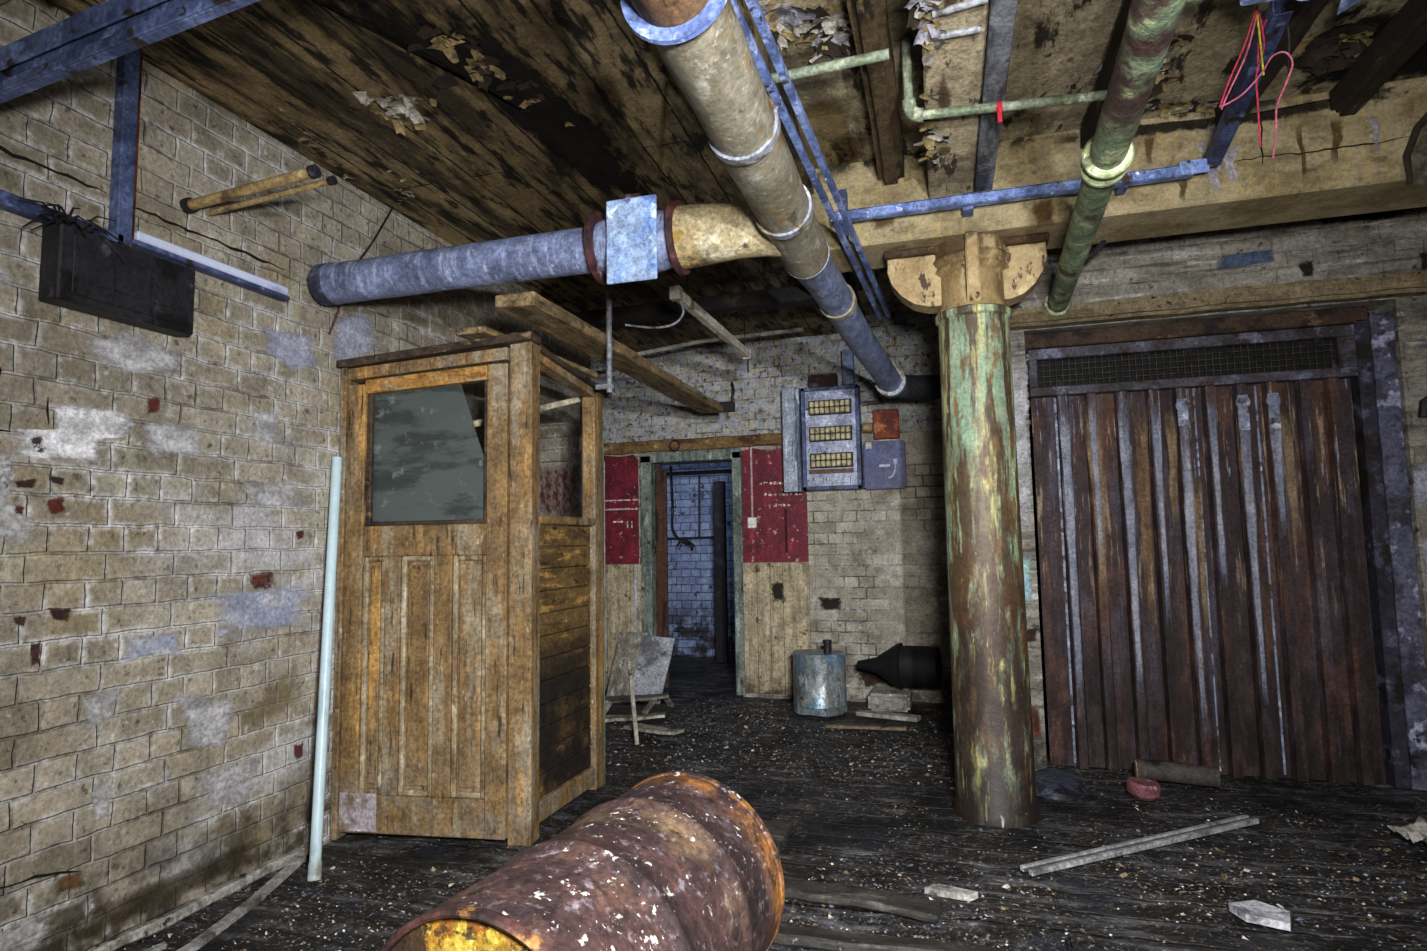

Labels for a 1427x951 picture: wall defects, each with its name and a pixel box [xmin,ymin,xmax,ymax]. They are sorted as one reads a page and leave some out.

crack [44,397,52,424]
peeling [1012,359,1031,531]
peeling [1023,558,1032,601]
damp [52,845,252,949]